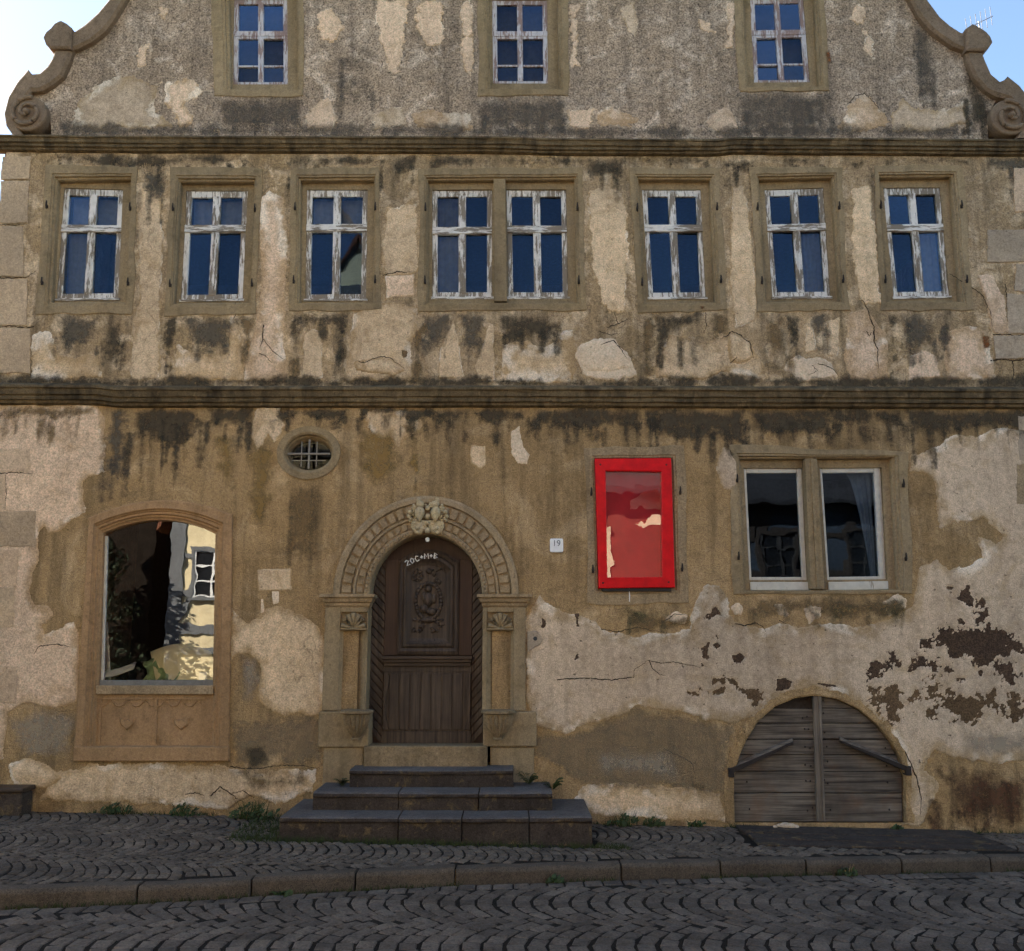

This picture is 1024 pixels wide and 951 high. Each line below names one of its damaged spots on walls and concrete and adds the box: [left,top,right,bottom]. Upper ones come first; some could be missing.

damp [164,317,253,361]
damp [291,313,347,364]
damp [501,316,561,354]
damp [644,313,727,373]
crack [860,298,879,368]
damp [99,408,271,519]
damp [475,408,1024,468]
flaking render [0,405,106,760]
flaking render [231,568,324,717]
crack [557,660,700,681]
flaking render [525,428,1024,828]
crack [905,751,922,814]